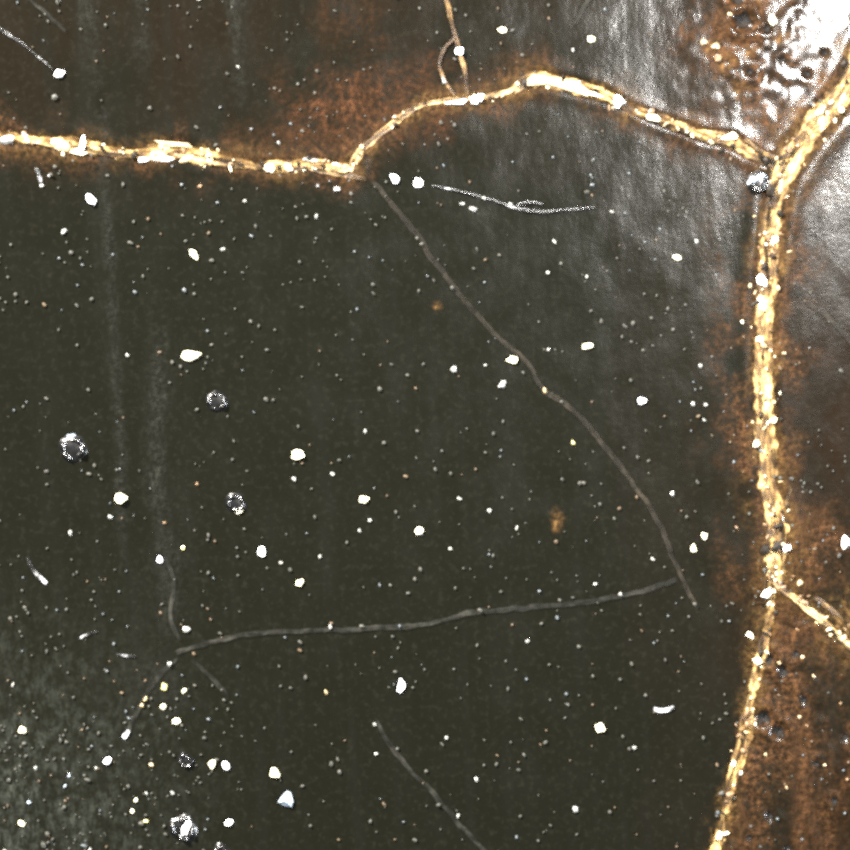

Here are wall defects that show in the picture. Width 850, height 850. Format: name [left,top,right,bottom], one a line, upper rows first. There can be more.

crack [0,0,616,180]
crack [620,50,850,850]